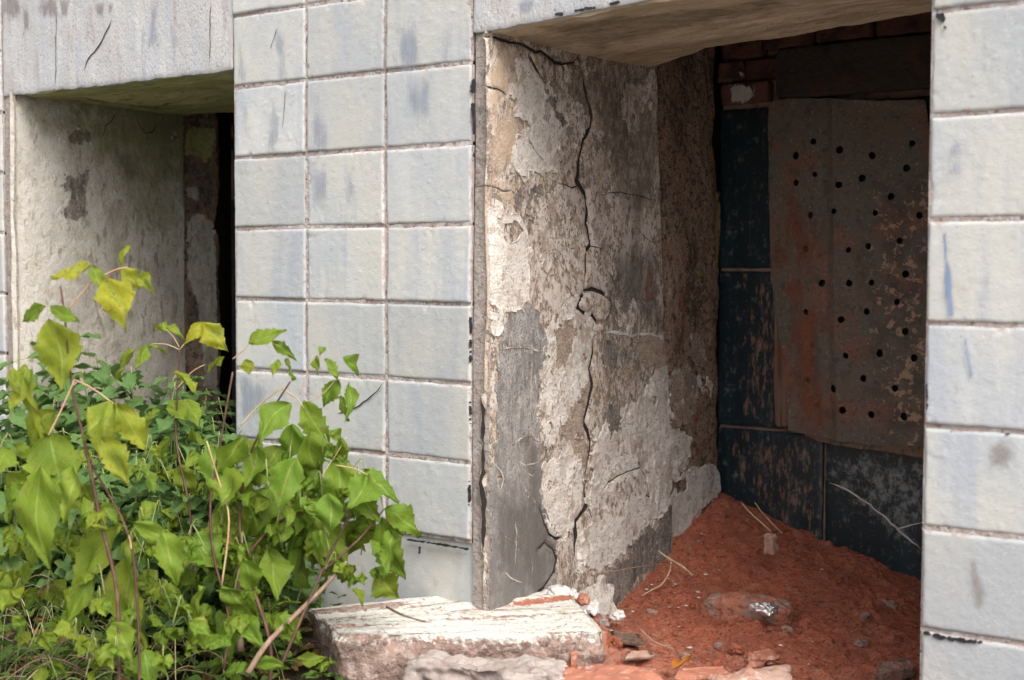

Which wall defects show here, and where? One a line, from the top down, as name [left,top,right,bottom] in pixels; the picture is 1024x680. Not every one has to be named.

crack [84,18,112,69]
flaking render [68,125,93,145]
flaking render [184,126,216,166]
flaking render [61,169,90,223]
flaking render [186,186,217,323]
crack [484,36,654,592]
flaking render [487,58,721,615]
flaking render [202,344,218,391]